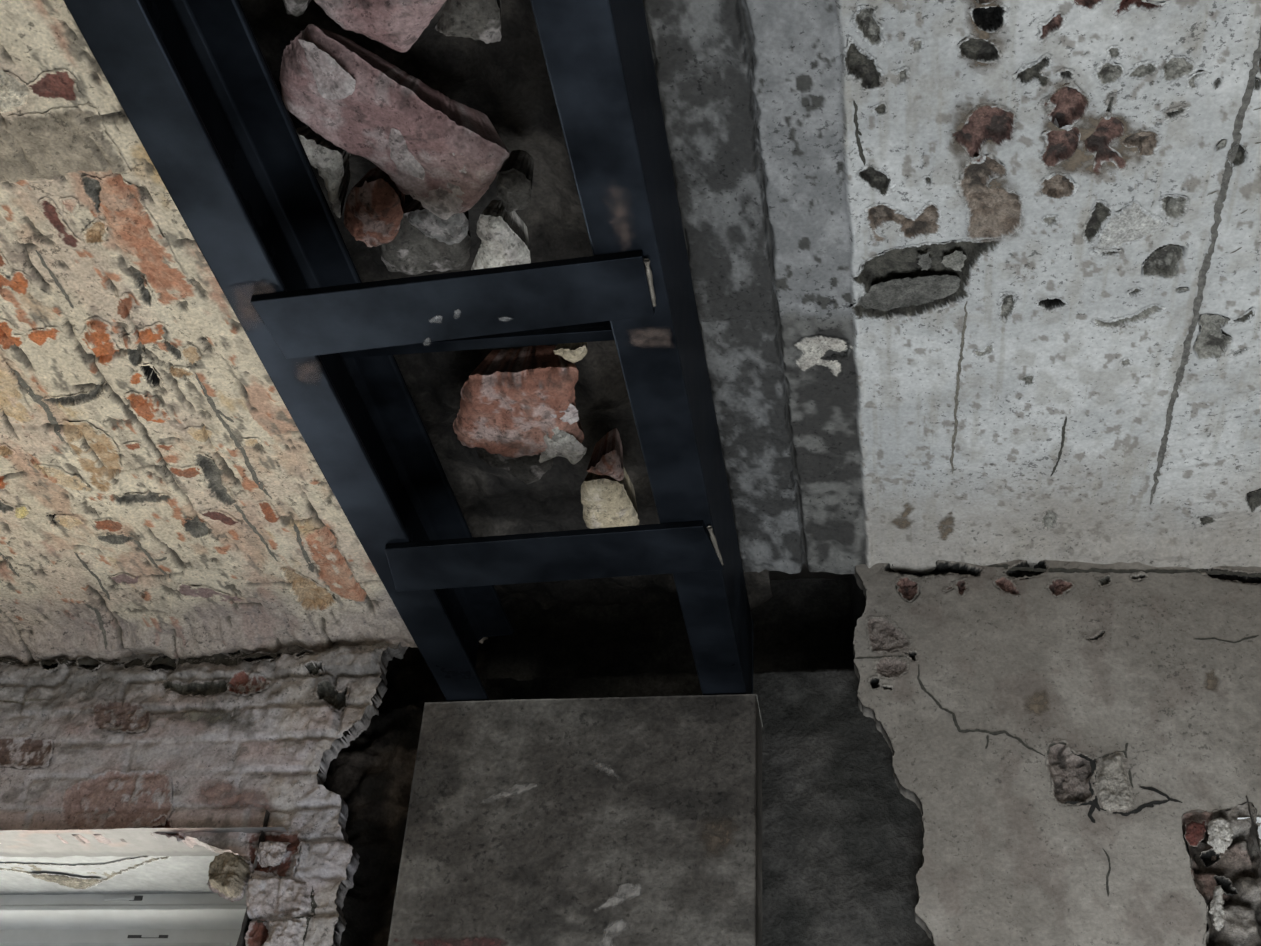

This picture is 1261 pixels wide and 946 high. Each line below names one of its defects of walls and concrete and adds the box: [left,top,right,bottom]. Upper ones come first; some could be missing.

flaking render [26,69,83,104]
flaking render [37,197,82,249]
flaking render [0,252,31,298]
flaking render [79,173,197,366]
crack [1150,27,1261,505]
flaking render [58,420,204,494]
flaking render [198,510,241,527]
flaking render [257,500,281,524]
flaking render [301,525,367,603]
crack [854,656,1182,896]
flaking render [244,832,312,946]
spalling [1181,803,1261,946]